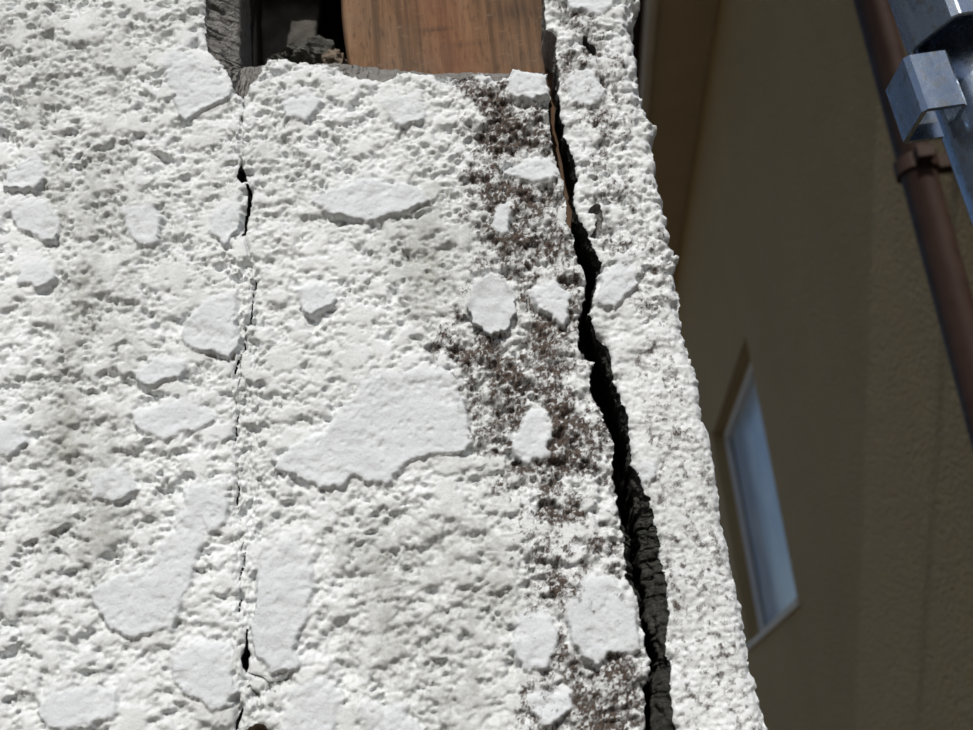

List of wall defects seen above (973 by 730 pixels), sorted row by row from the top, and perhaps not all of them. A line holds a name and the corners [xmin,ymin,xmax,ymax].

spalling [204,0,262,99]
spalling [309,63,511,82]
spalling [534,0,560,129]
damp [552,0,633,180]
crack [237,151,253,252]
damp [595,164,667,265]
damp [637,263,674,323]
damp [430,74,647,730]
crack [548,99,676,730]
crack [234,281,290,730]